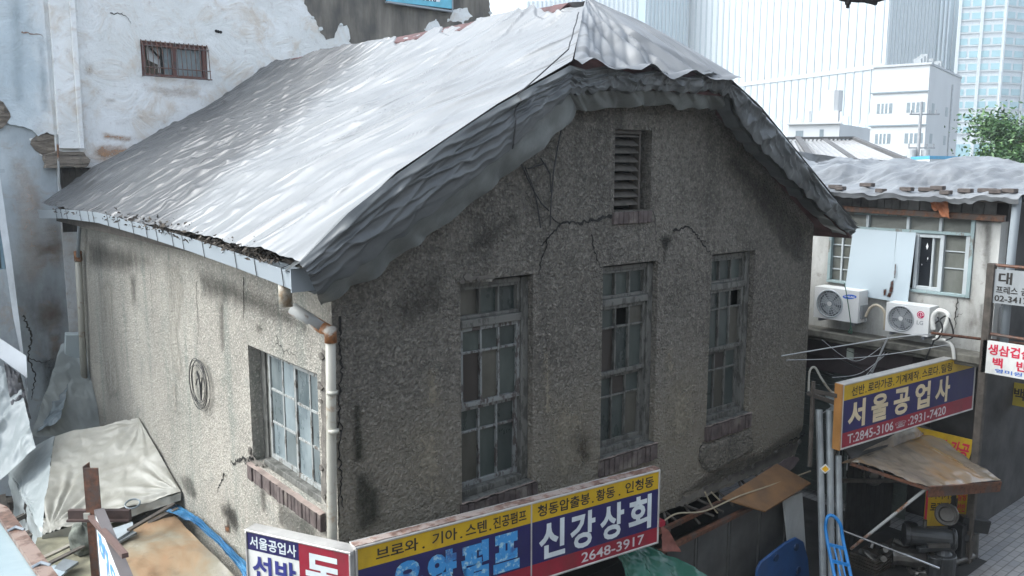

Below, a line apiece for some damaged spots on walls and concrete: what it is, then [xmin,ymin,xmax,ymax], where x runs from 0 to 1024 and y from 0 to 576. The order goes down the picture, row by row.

spalling [0,101,11,129]
spalling [29,132,55,156]
crack [539,214,612,271]
crack [653,212,711,256]
crack [22,315,53,400]
water stain [224,506,237,527]